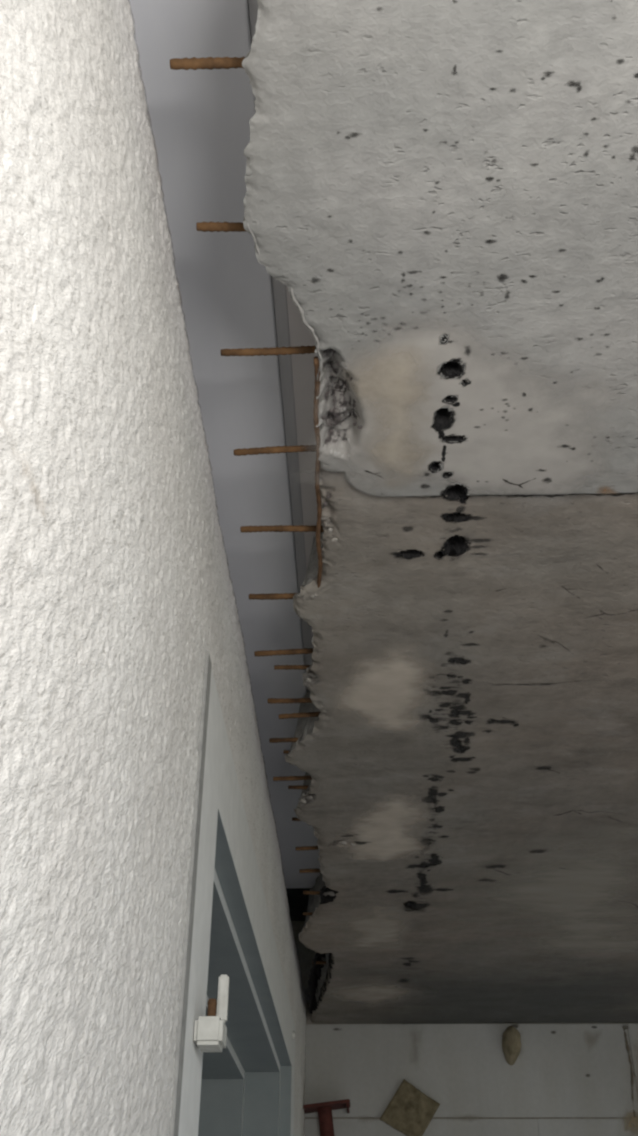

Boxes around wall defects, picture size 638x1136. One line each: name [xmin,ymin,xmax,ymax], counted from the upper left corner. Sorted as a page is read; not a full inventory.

spalling [220,345,362,673]
spalling [267,691,321,821]
spalling [295,846,339,937]
spalling [307,952,335,1014]